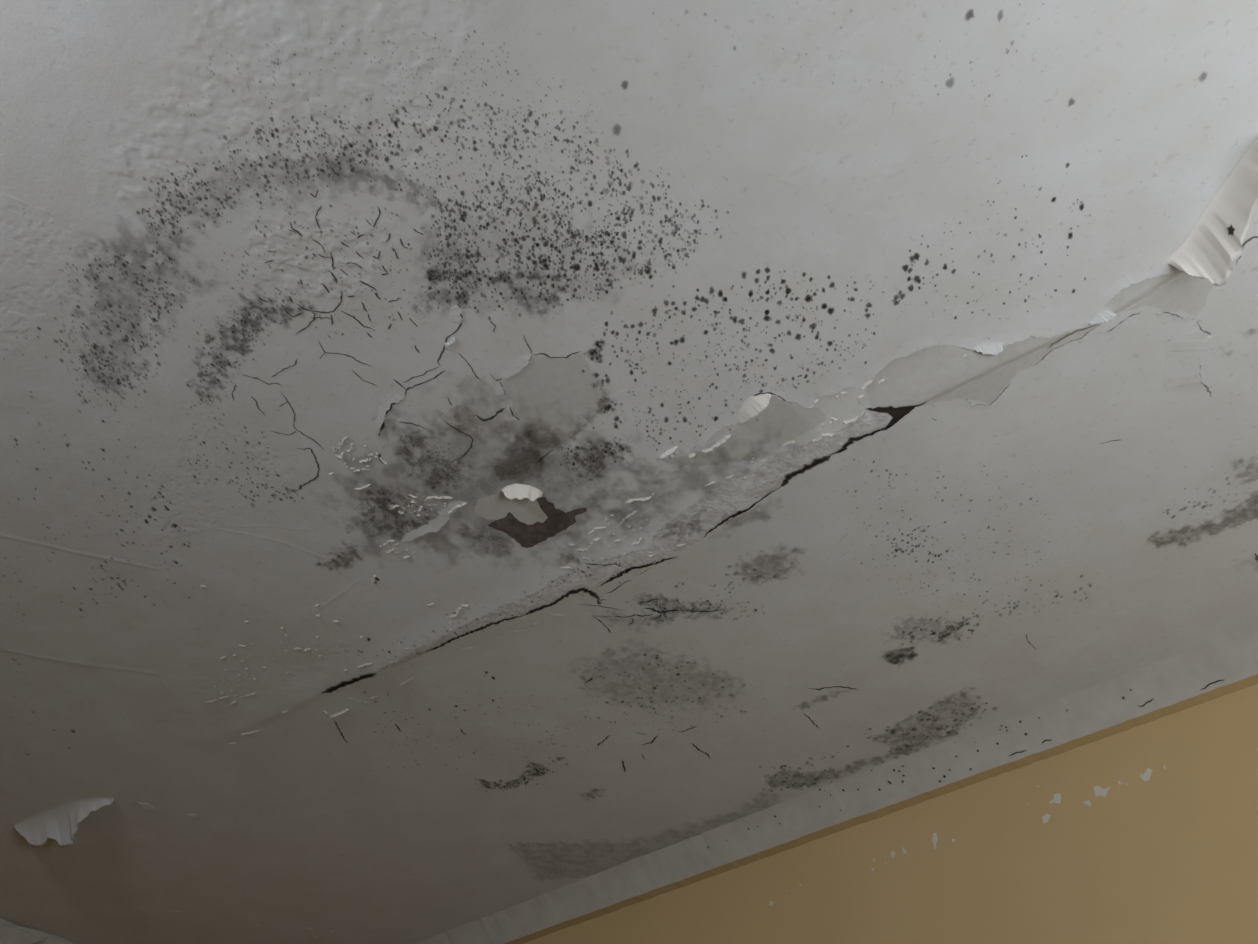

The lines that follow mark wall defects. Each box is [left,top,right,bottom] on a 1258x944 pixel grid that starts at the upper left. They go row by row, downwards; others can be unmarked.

leakage [137,87,701,316]
leakage [220,300,292,365]
peeling [329,391,405,490]
crack [232,190,578,491]
peeling [483,352,626,449]
leakage [568,399,624,469]
leakage [583,268,875,450]
leakage [895,248,956,305]
peeling [658,138,1258,486]
spalling [375,483,655,569]
leakage [886,632,917,664]
peeling [13,797,114,848]